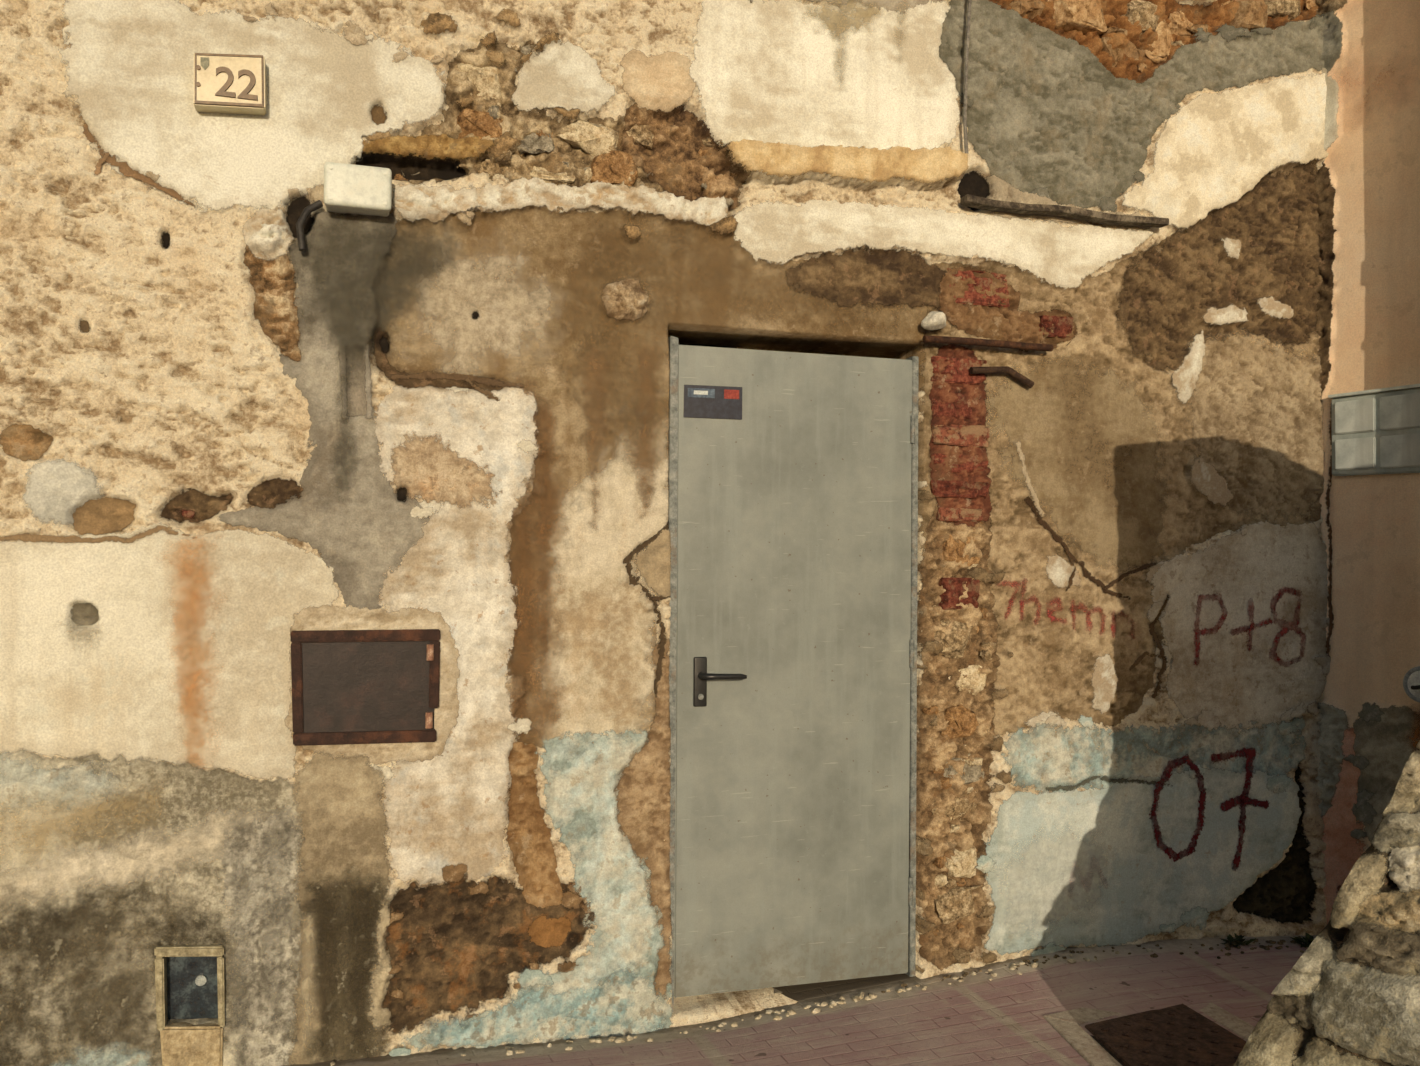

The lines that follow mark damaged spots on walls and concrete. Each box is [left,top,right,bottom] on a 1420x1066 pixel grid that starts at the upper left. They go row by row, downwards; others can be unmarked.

water stain [294,214,551,488]
water stain [568,214,859,507]
crack [0,525,197,543]
water stain [511,402,559,736]
spalling [356,0,1384,1057]
crack [1016,441,1170,699]
water stain [0,750,394,1066]
crack [1046,776,1173,791]